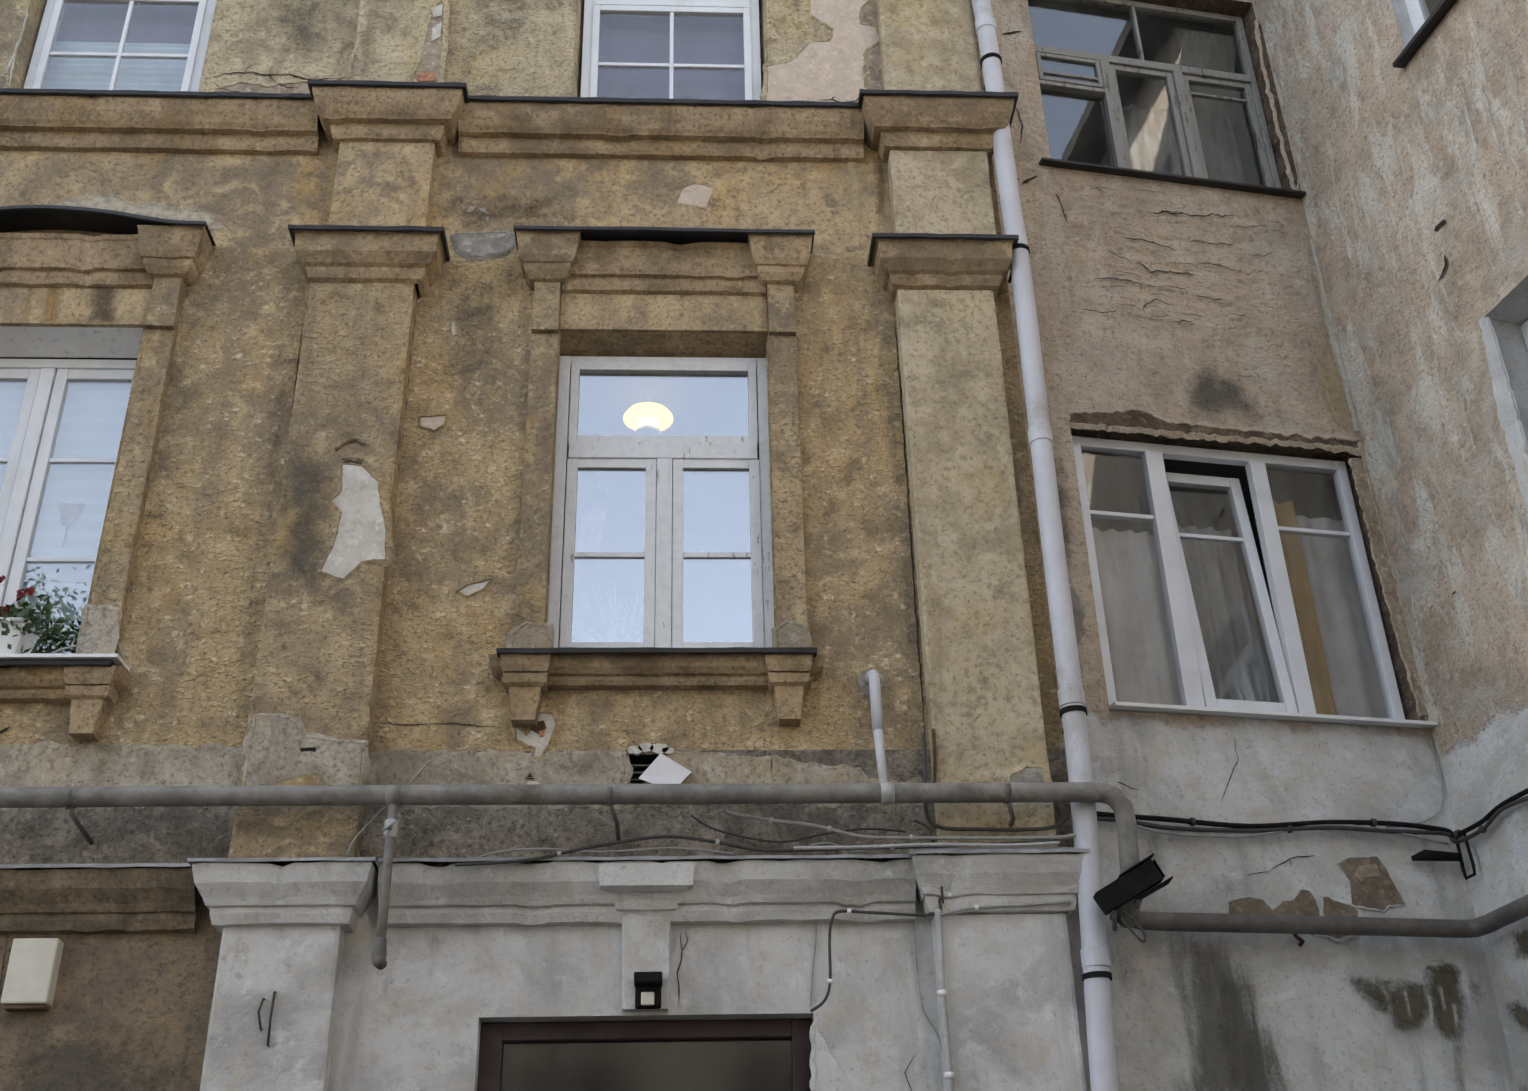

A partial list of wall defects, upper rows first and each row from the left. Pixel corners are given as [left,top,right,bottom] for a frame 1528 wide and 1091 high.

crack [207,64,337,92]
spalling [409,0,450,82]
peeling [760,0,883,102]
peeling [454,205,514,257]
damp [1191,372,1249,412]
peeling [317,462,395,583]
peeling [0,708,625,787]
peeling [666,752,773,784]
peeling [1226,855,1407,917]
damp [1191,949,1279,1091]